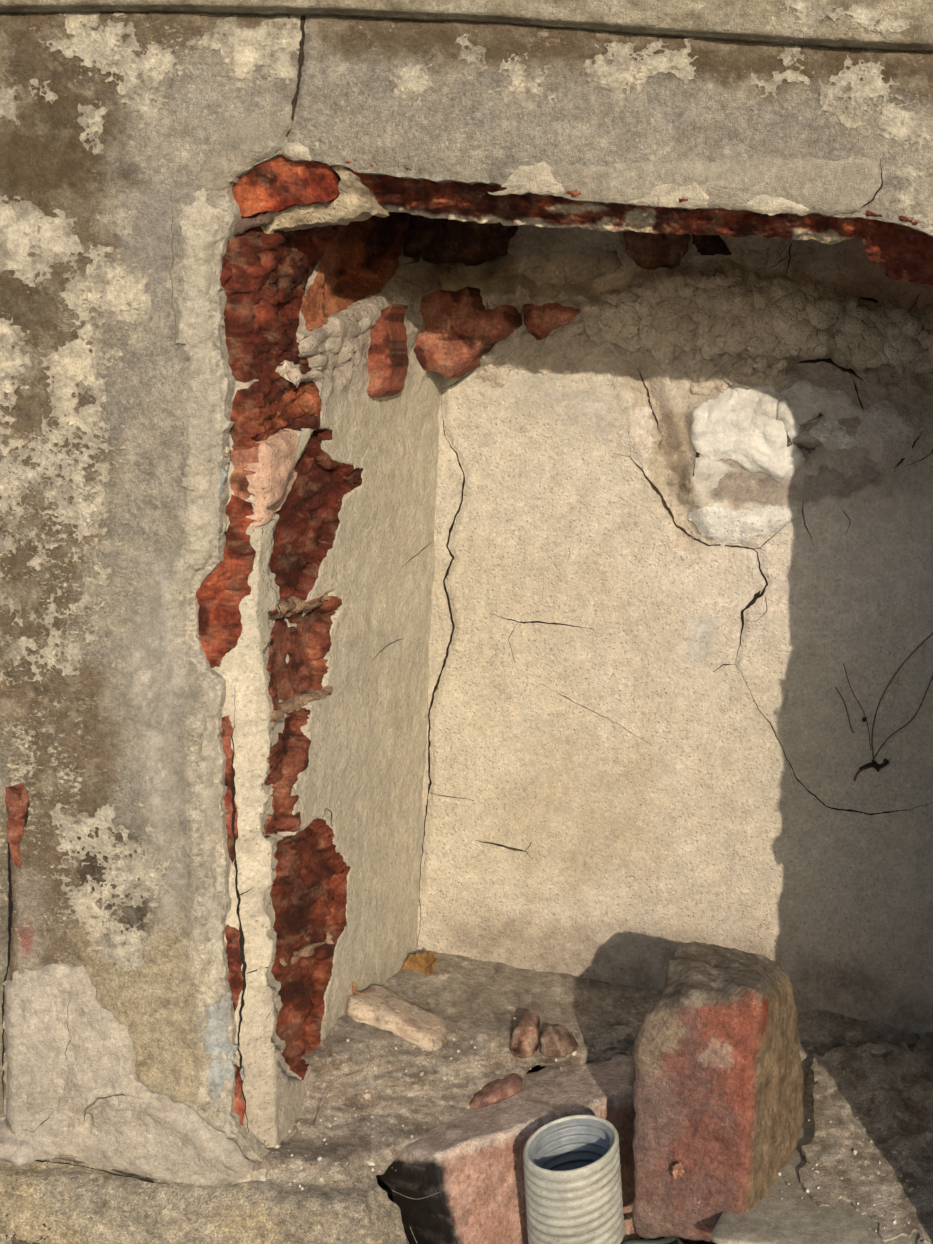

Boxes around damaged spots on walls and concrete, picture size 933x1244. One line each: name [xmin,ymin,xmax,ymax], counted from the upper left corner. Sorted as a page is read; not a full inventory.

crack [276,15,306,153]
water stain [788,56,844,71]
peeling [281,142,315,162]
peeling [501,162,565,195]
peeling [627,183,709,208]
spalling [623,230,732,270]
water stain [132,559,183,719]
spalling [175,188,580,1127]
crack [405,374,473,944]
crack [613,452,932,815]
water stain [77,829,181,932]
crack [476,840,533,859]